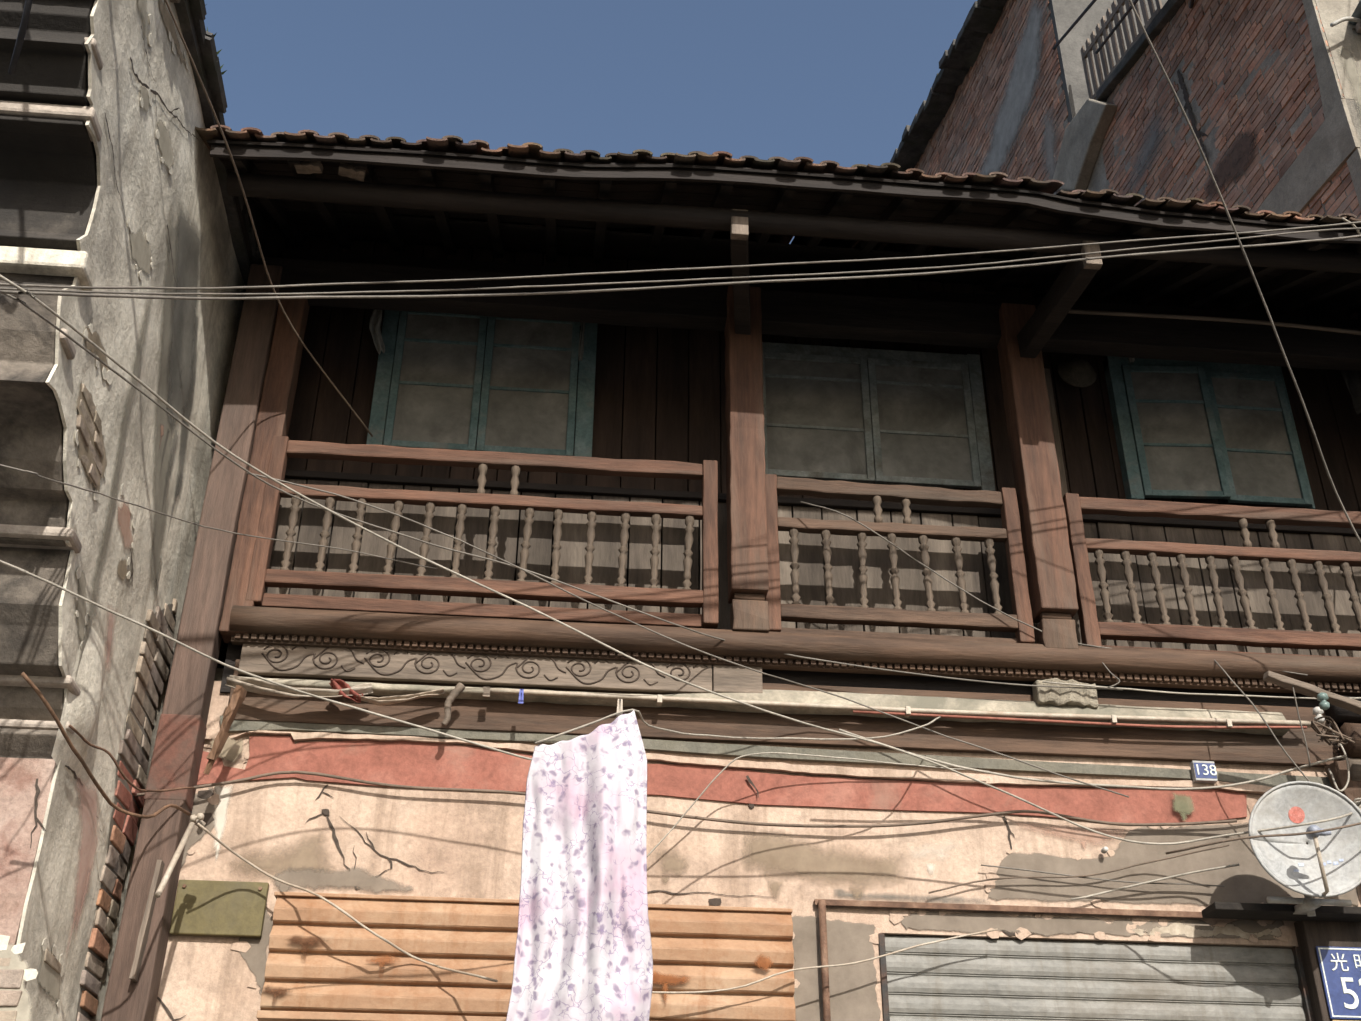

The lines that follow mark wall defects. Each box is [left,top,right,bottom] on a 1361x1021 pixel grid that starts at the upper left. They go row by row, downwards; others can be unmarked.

flaking render [138,0,189,71]
crack [130,26,199,141]
flaking render [127,218,153,281]
flaking render [84,323,113,385]
flaking render [75,381,107,502]
crack [307,784,444,890]